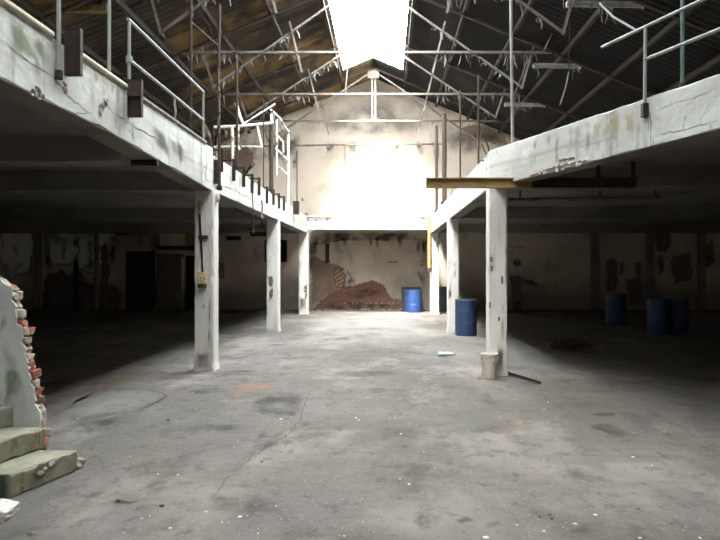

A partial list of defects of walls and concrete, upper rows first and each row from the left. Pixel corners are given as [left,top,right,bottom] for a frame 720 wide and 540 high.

spalling [30,85,45,100]
crack [648,88,718,148]
spalling [530,157,586,177]
water stain [310,233,356,268]
water stain [369,233,409,246]
peeling [300,256,401,310]
flaking render [28,361,42,379]
crack [212,391,310,497]